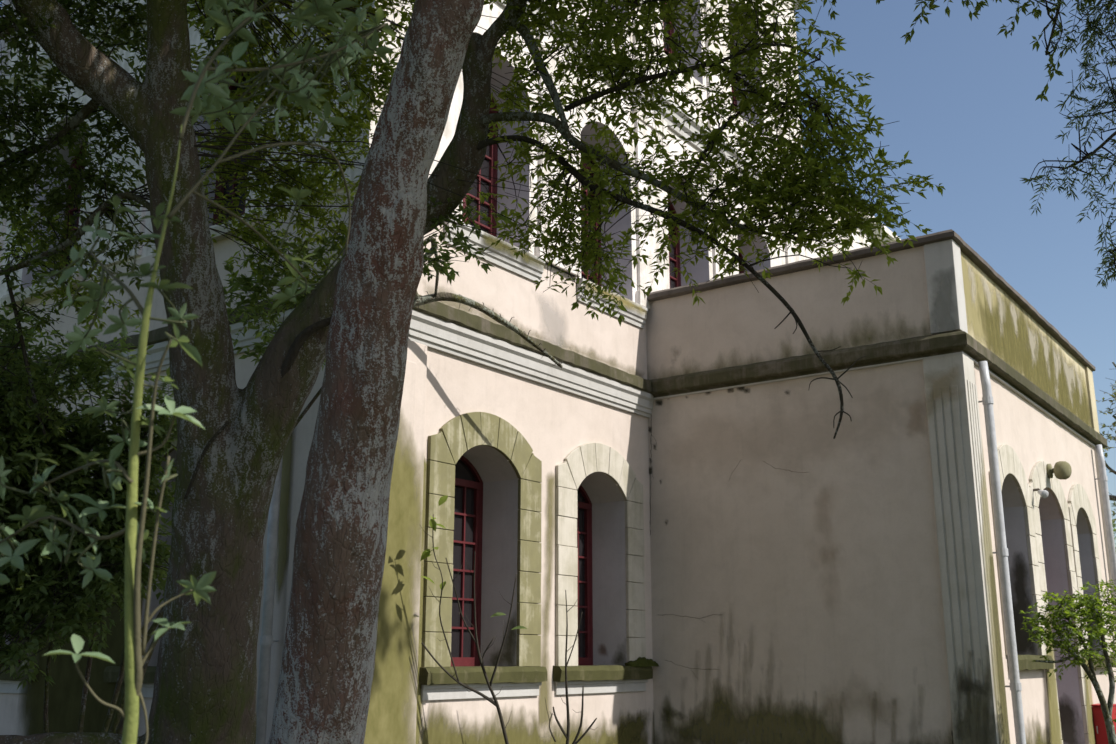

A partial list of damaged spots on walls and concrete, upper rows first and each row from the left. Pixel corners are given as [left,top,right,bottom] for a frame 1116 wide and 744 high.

water stain [969,267,1081,402]
water stain [609,713,646,744]
water stain [956,680,994,744]